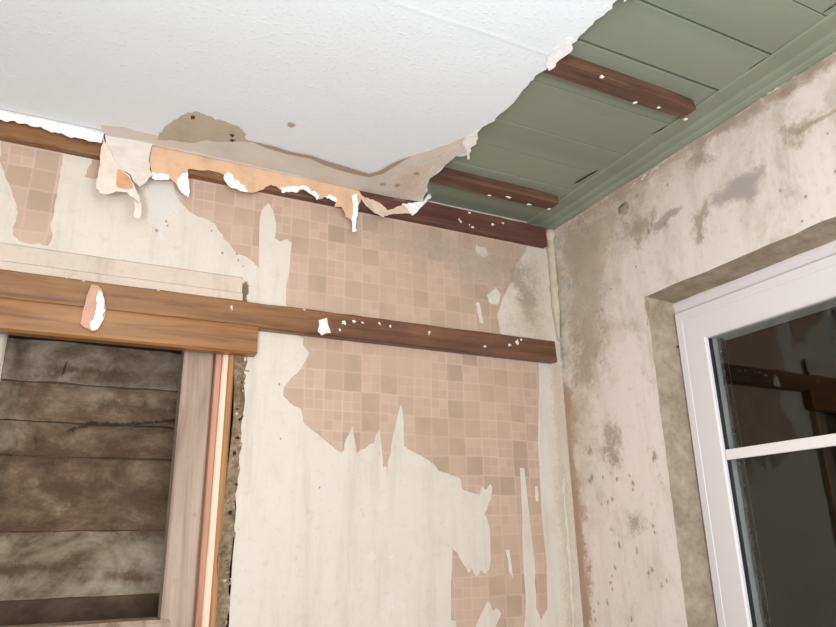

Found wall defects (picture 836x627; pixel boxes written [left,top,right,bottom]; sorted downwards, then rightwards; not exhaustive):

crack [800,109,836,132]
peeling [96,135,432,232]
leakage [561,53,836,387]
flaking render [215,356,249,627]
leakage [601,427,621,466]